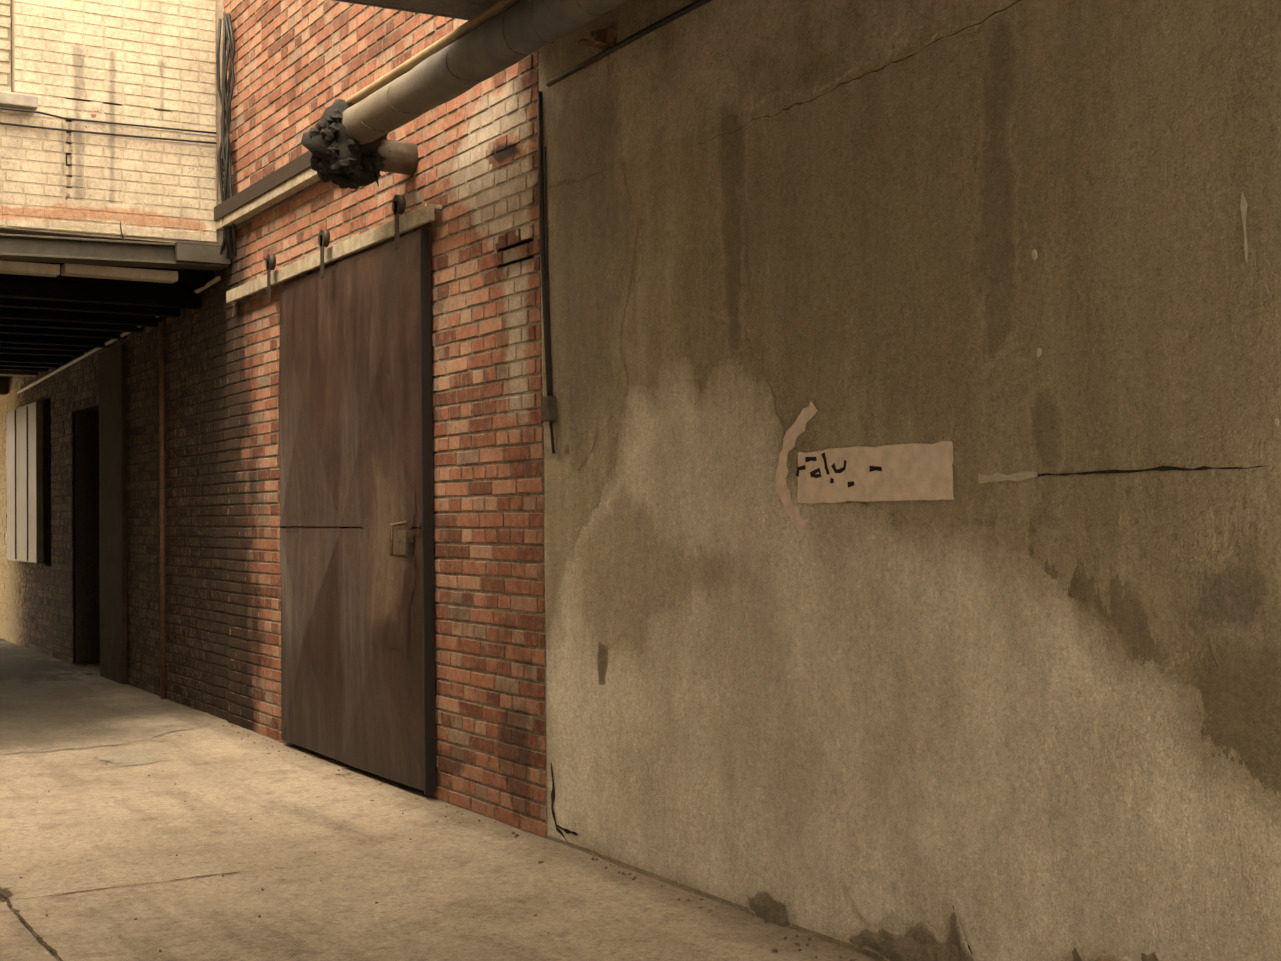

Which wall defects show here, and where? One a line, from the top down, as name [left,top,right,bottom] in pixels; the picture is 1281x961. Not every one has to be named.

leakage [442,57,540,444]
leakage [547,0,1281,961]
crack [978,466,1264,484]
crack [0,863,325,961]
spalling [746,889,792,928]
spalling [848,907,975,961]
spalling [1072,948,1160,961]